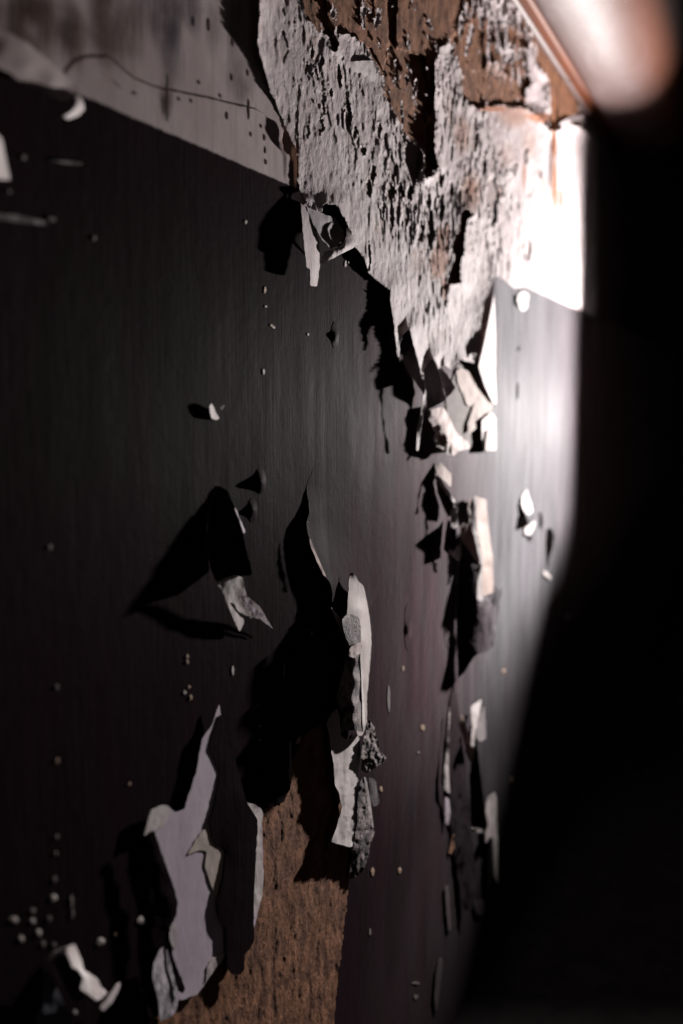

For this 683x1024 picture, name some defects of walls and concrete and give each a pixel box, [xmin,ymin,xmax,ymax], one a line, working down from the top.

peeling [257,0,596,451]
peeling [206,486,273,631]
peeling [435,476,502,625]
flaking render [144,705,386,1024]